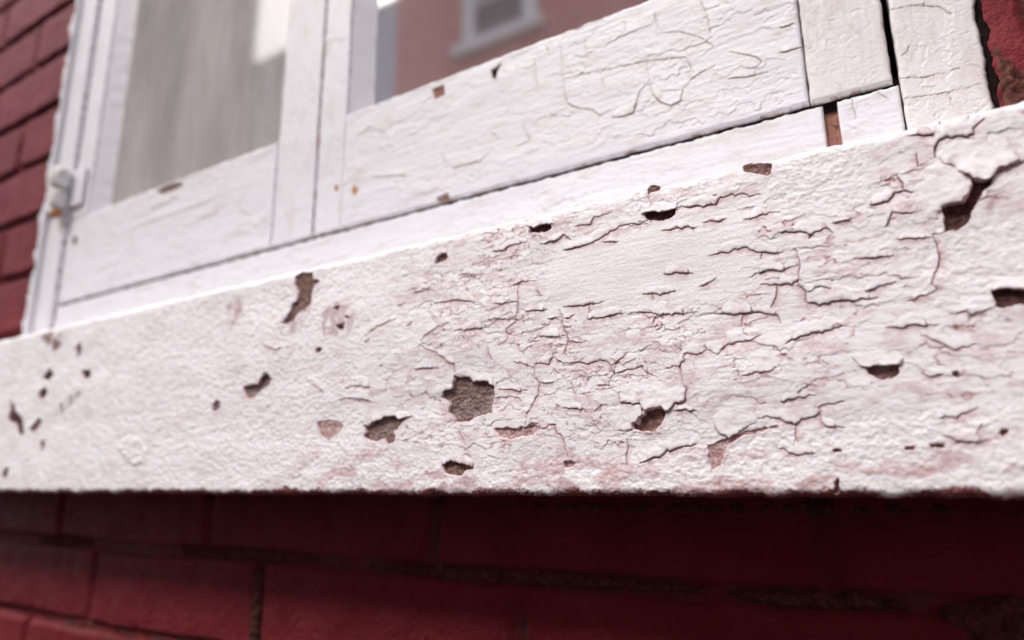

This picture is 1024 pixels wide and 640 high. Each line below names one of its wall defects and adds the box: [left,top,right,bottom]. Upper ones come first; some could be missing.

peeling [743,163,772,176]
peeling [912,134,1020,232]
crack [994,159,1024,175]
peeling [640,185,677,221]
crack [365,0,1000,463]
peeling [284,272,319,324]
peeling [991,276,1024,309]
peeling [851,350,903,380]
peeling [428,368,494,431]
peeling [608,377,686,432]
peeling [366,410,410,444]
peeling [442,455,474,476]